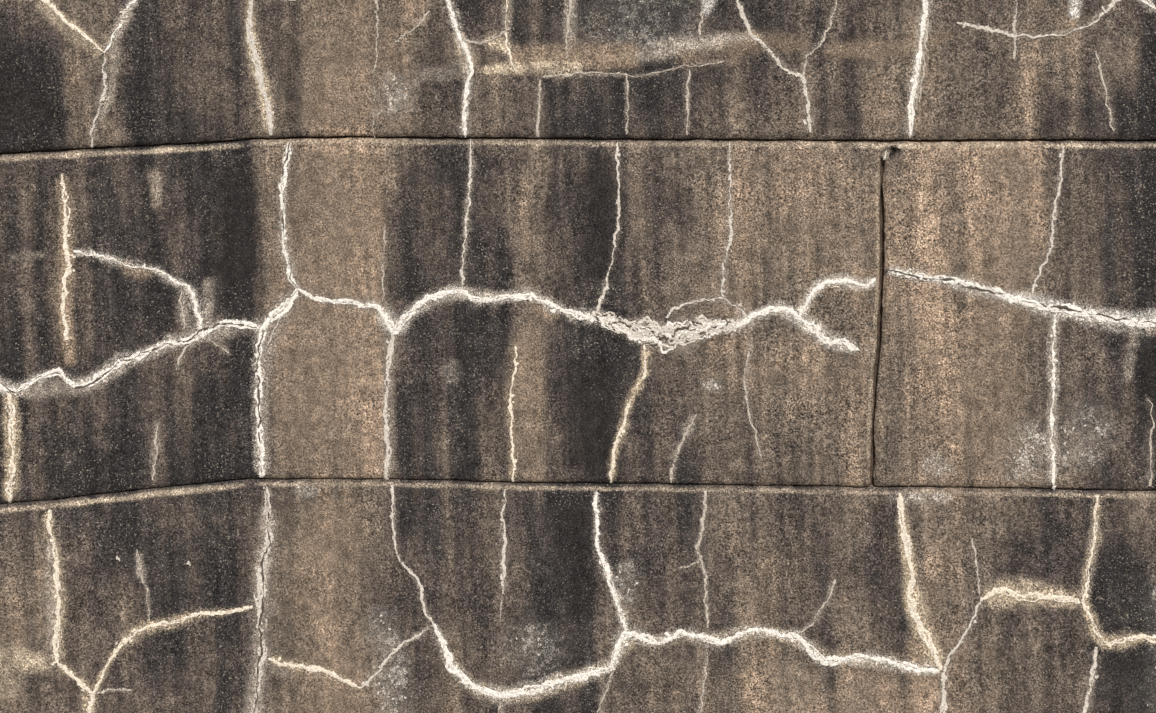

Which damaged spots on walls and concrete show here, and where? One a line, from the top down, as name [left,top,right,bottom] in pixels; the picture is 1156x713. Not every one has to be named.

leakage [367,76,408,113]
leakage [481,14,761,75]
crack [907,0,929,139]
crack [957,0,1156,131]
leakage [150,172,160,205]
crack [0,0,876,503]
crack [885,146,1156,490]
crack [500,346,519,617]
leakage [1005,423,1045,480]
leakage [9,647,48,671]
leakage [373,614,408,713]
crack [46,485,1156,713]